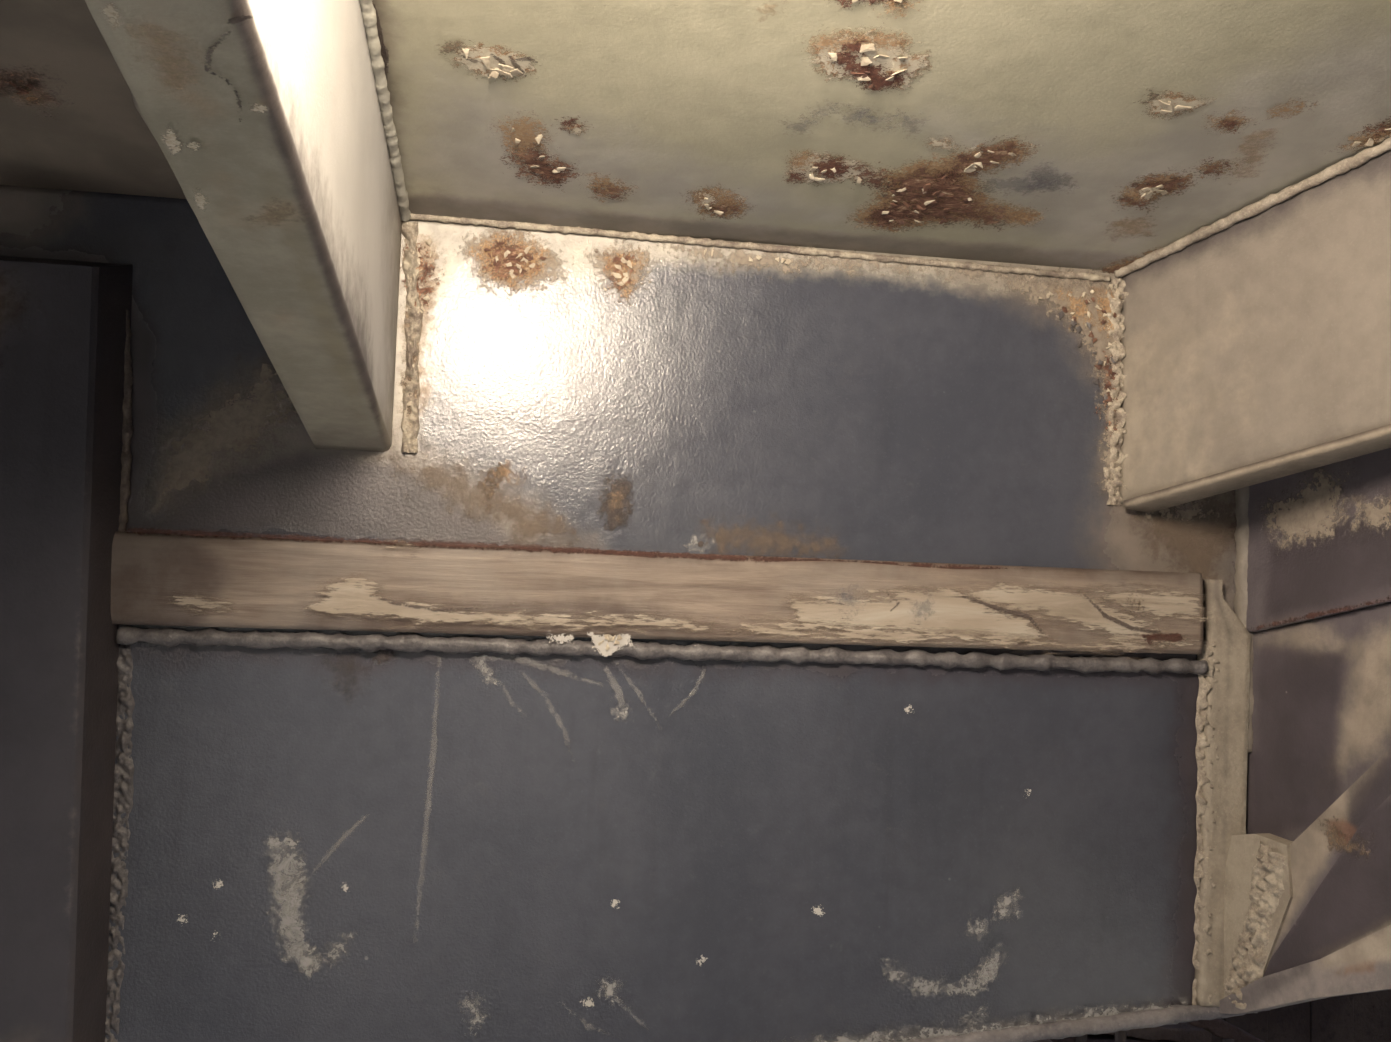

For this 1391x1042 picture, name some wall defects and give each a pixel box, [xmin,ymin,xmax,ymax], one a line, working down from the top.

crack [205,16,252,107]
peeling [440,41,537,82]
corrosion [494,113,636,202]
corrosion [781,137,1041,233]
corrosion [1112,157,1238,215]
corrosion [463,229,567,292]
corrosion [591,239,651,306]
damp [156,362,297,506]
damp [598,476,633,530]
peeling [1261,468,1391,549]
peeling [732,498,1237,652]
peeling [306,578,712,657]